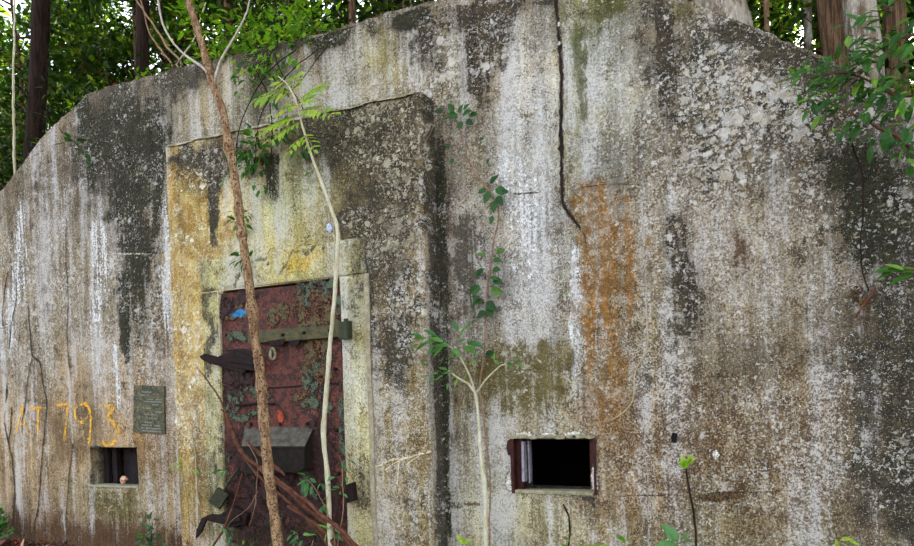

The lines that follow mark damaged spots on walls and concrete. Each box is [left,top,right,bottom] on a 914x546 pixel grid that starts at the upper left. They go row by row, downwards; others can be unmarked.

crack [1,271,48,533]
crack [65,443,74,531]
leakage [75,96,242,409]
leakage [299,93,486,537]
leakage [391,0,565,115]
crack [551,0,587,248]
corrosion [570,176,650,451]